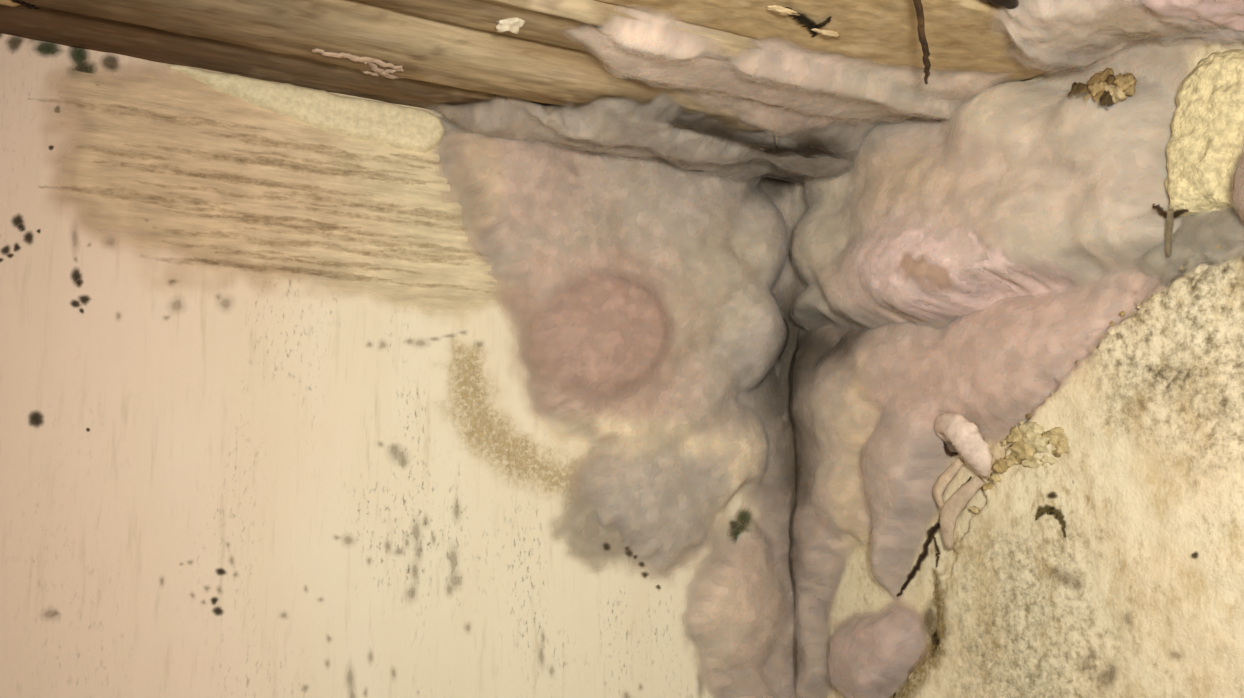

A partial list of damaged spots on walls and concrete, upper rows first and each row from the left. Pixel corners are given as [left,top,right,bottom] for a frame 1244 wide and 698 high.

water stain [0,33,22,49]
water stain [37,42,117,85]
water stain [0,216,40,262]
crack [943,441,972,486]
crack [897,518,940,597]